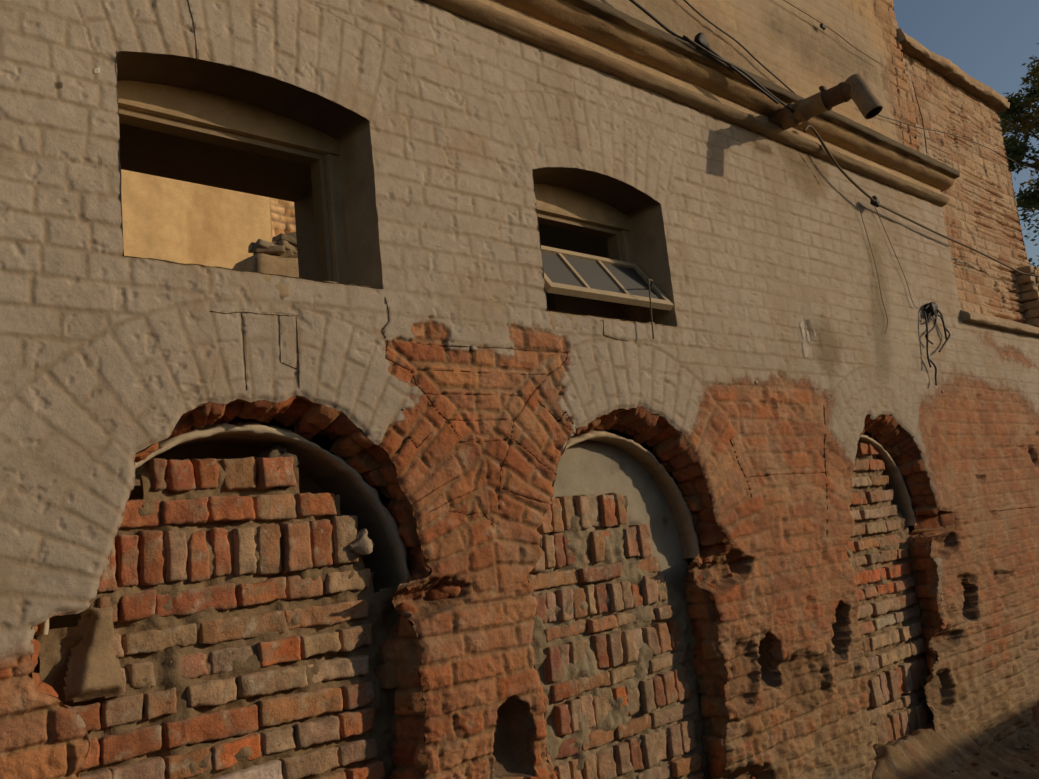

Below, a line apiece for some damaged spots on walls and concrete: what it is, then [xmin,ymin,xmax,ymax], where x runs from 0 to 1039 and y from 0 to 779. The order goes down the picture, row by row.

peeling [0,527,119,779]
crack [381,298,577,527]
peeling [122,322,876,779]
peeling [857,373,1039,749]